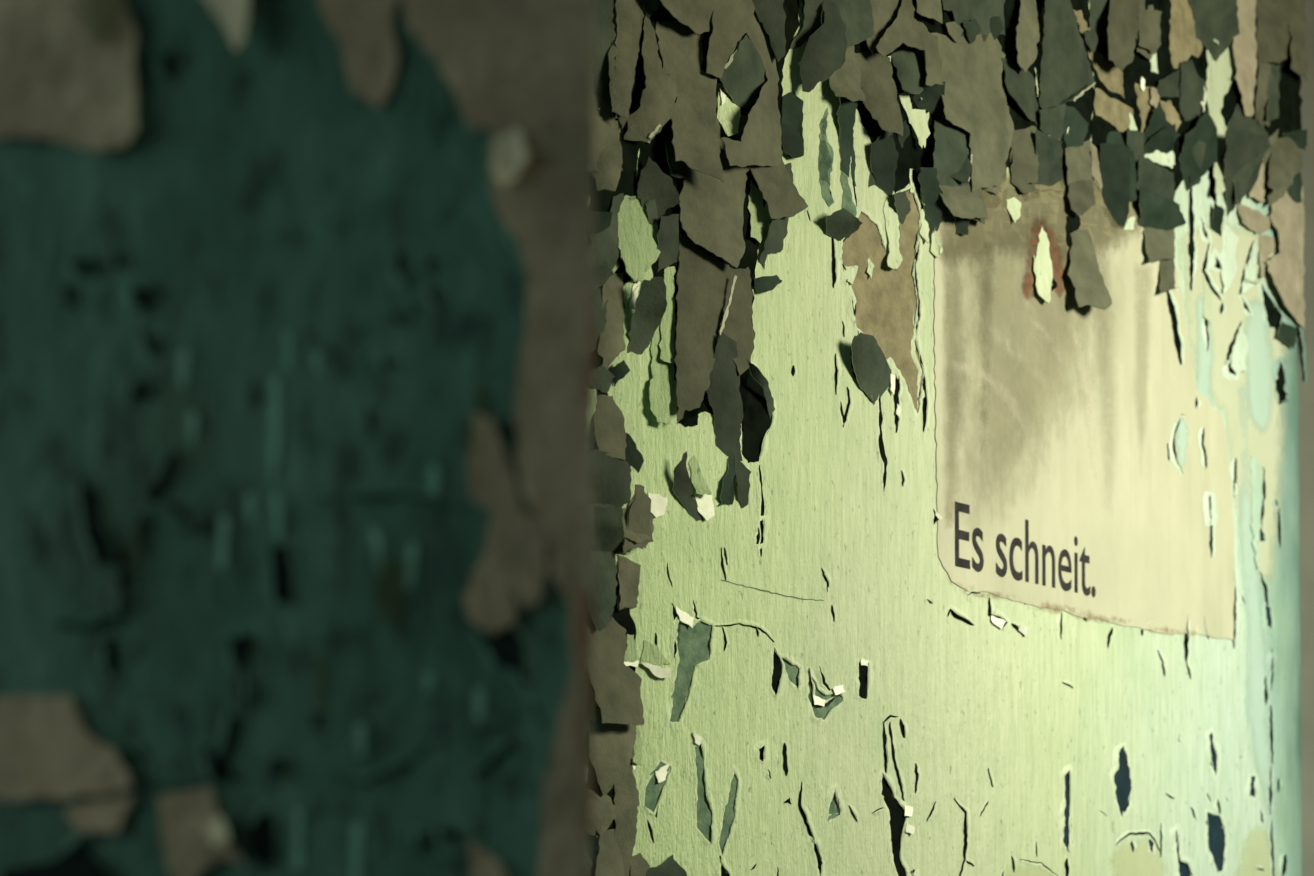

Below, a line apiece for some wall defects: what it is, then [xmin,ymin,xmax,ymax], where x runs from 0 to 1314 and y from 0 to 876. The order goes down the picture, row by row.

peeling [0,0,138,152]
peeling [205,0,249,51]
water stain [942,177,1140,474]
corrosion [1023,221,1065,299]
peeling [318,0,1308,876]
peeling [266,538,299,609]
peeling [0,695,132,876]
peeling [157,787,283,876]